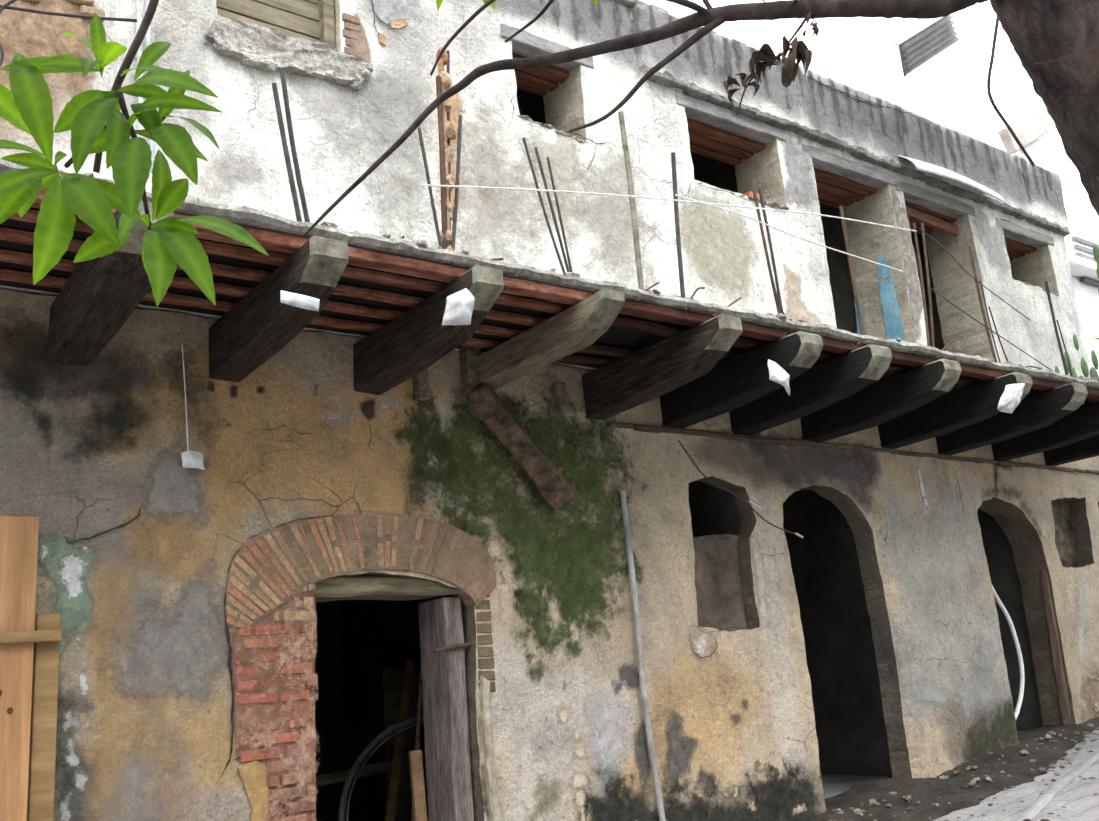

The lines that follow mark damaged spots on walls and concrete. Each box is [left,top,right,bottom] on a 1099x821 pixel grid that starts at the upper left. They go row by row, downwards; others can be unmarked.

spalling [203,0,421,171]
damp [0,319,77,405]
damp [38,415,51,437]
damp [76,382,146,455]
damp [396,396,475,533]
crack [63,503,143,543]
peeling [38,536,94,657]
damp [517,602,584,681]
peeling [79,675,90,695]
peeling [56,710,88,821]
damp [537,780,558,810]
damp [558,663,821,821]